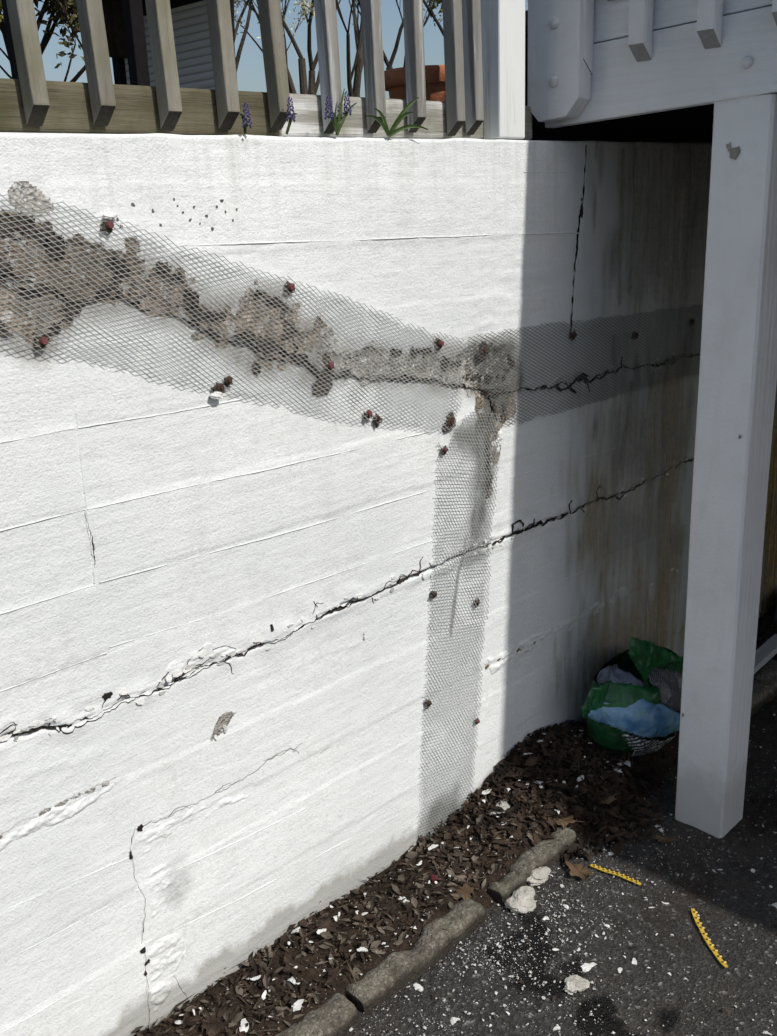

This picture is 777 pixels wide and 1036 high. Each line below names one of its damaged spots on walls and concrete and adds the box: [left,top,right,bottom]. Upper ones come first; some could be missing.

spalling [0,181,516,499]
crack [0,458,694,743]
crack [0,270,700,423]
water stain [451,505,485,633]
water stain [457,345,522,492]
crack [570,145,587,332]
corrosion [759,387,777,615]
crack [129,743,328,1026]